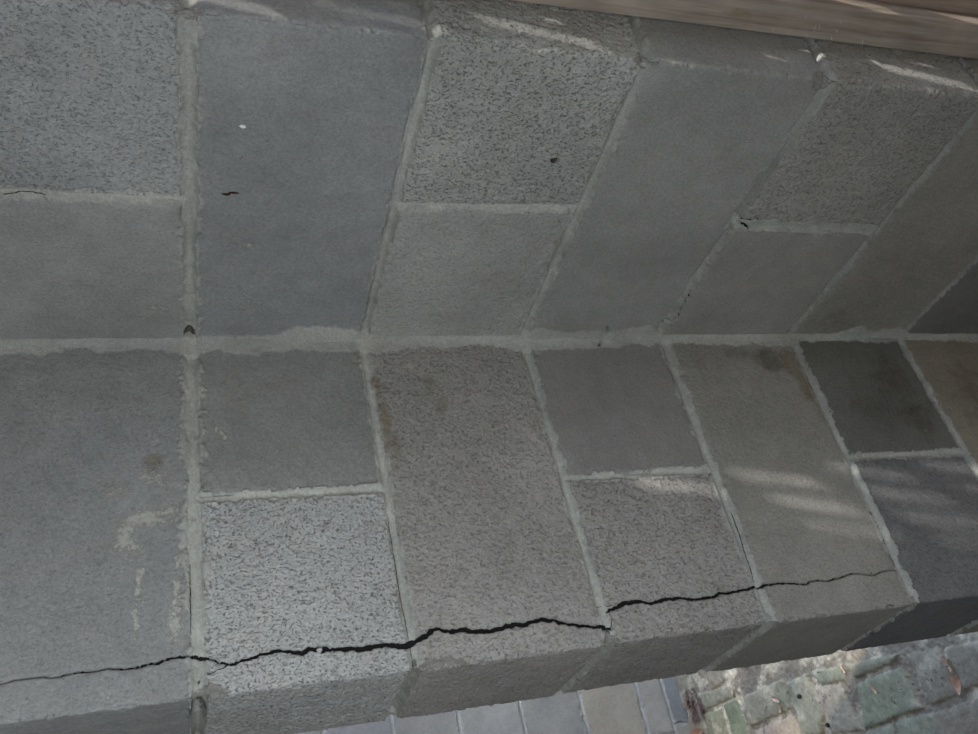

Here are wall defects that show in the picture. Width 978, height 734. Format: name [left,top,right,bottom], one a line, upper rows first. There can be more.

crack [32,510,895,679]